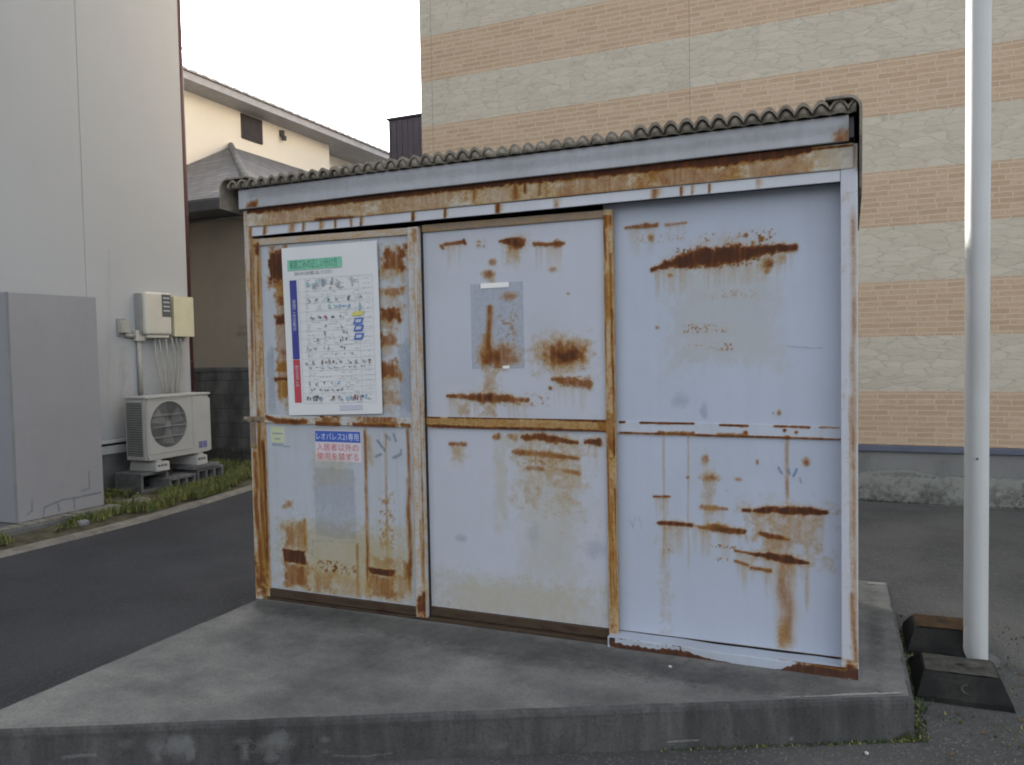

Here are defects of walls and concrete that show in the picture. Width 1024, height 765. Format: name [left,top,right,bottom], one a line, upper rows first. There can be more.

corrosion [246,130,855,397]
corrosion [253,215,855,618]
corrosion [657,479,829,646]
corrosion [779,593,858,670]